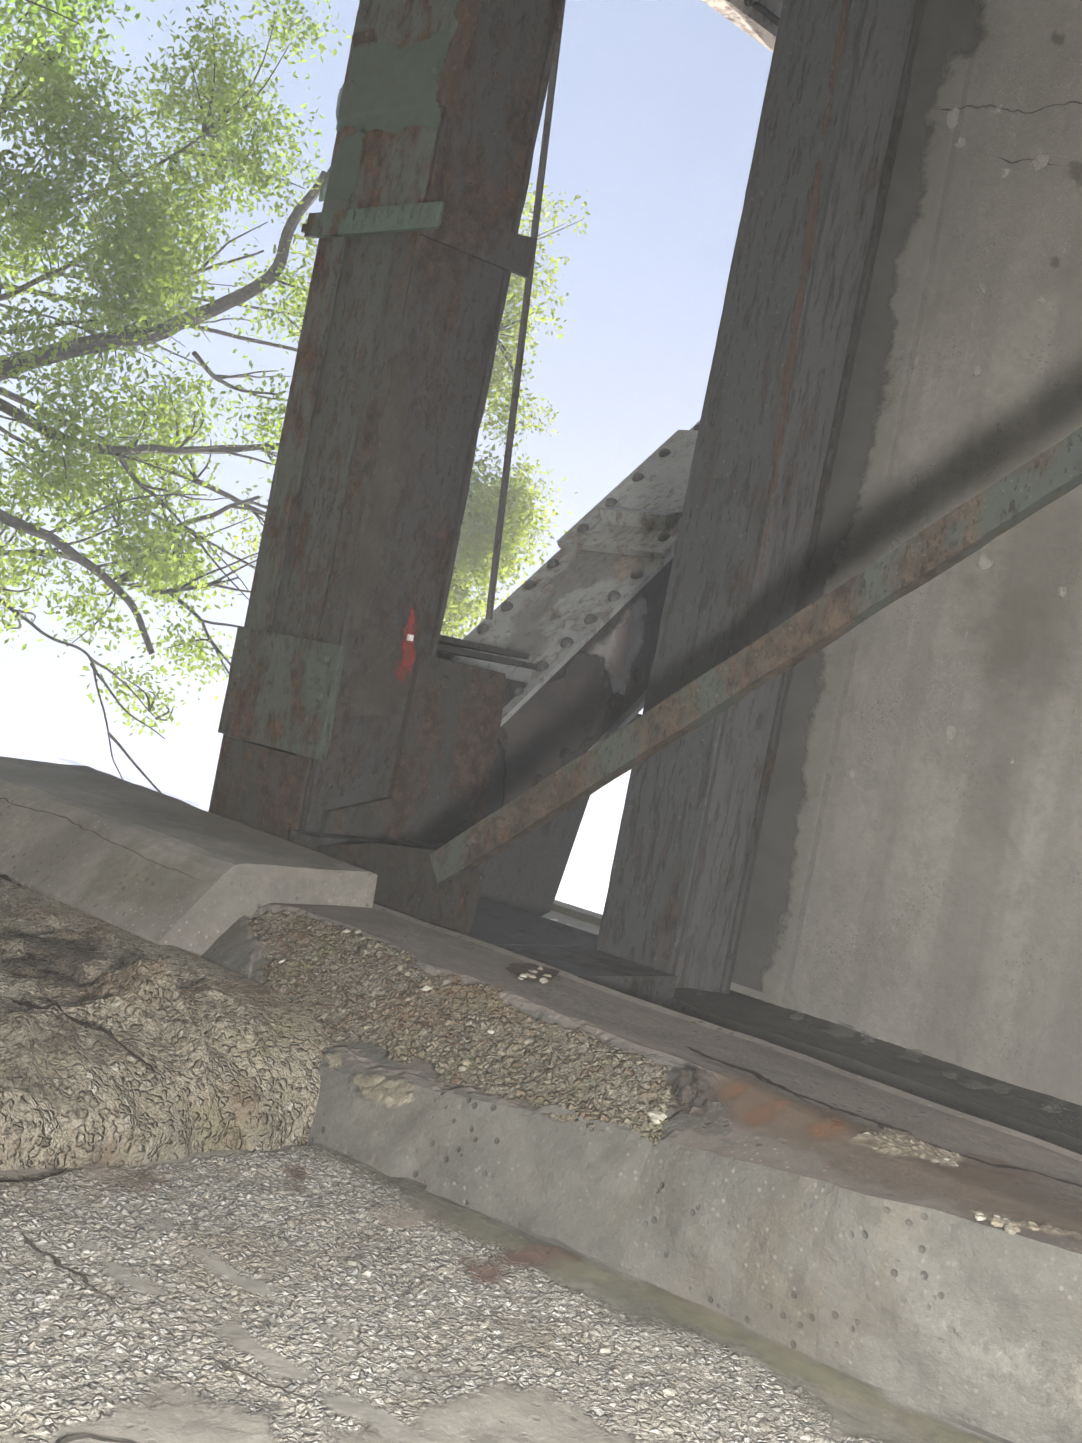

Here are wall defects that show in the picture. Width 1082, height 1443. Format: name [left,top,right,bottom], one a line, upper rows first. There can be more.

rust [352,29,375,45]
peeling [319,0,459,202]
crack [938,101,1082,114]
crack [996,157,1060,166]
rust [501,652,612,808]
crack [0,798,200,881]
crack [0,875,33,892]
crack [13,1001,164,1082]
spalling [249,911,684,1146]
crack [686,1046,1082,1188]
spalling [0,1145,897,1443]